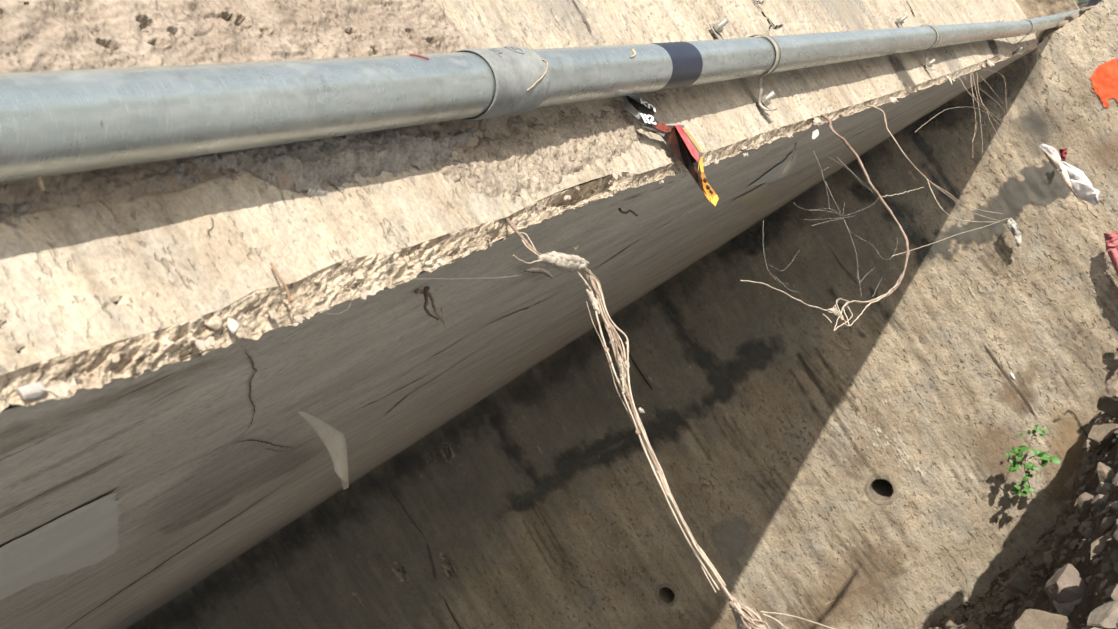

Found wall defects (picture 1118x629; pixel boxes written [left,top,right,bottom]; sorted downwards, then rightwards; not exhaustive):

spalling [698,42,1039,187]
spalling [0,160,688,414]
crack [236,346,290,452]
peeling [297,411,349,490]
leakage [444,288,780,516]